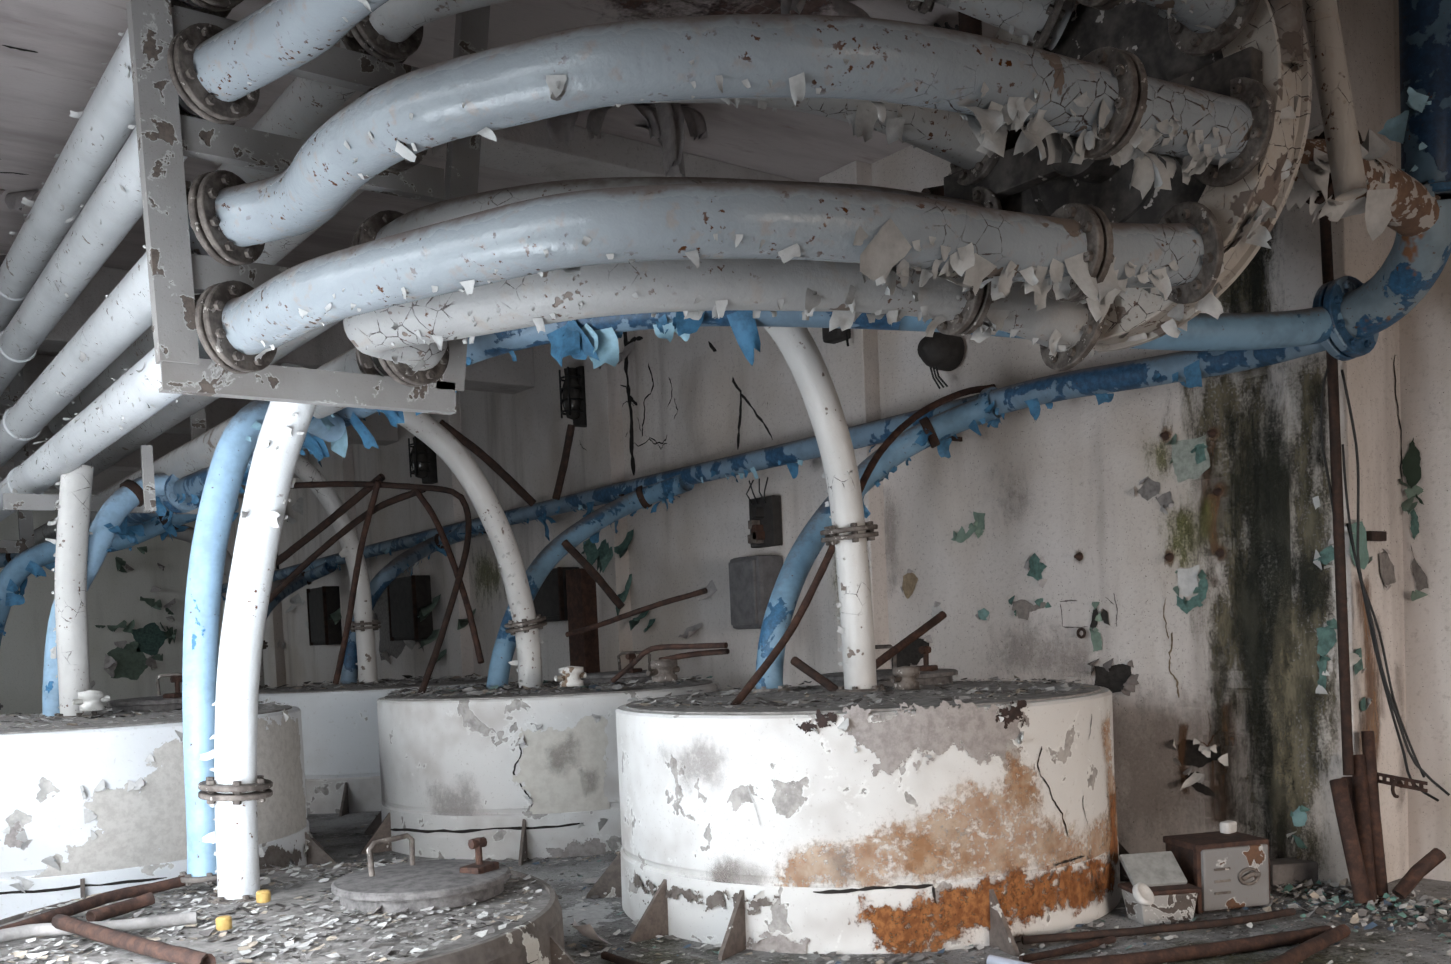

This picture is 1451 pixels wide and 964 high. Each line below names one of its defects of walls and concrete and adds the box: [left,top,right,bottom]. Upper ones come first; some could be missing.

peeling [960,82,1228,199]
peeling [651,295,784,366]
peeling [802,218,1179,357]
peeling [1008,553,1052,620]
spalling [1087,602,1139,696]
water stain [1209,383,1329,858]
crack [391,744,583,833]
peeling [796,696,1030,777]
corrosion [779,717,1118,954]
crack [1037,746,1088,866]
water stain [1178,725,1188,793]
crack [813,884,937,903]